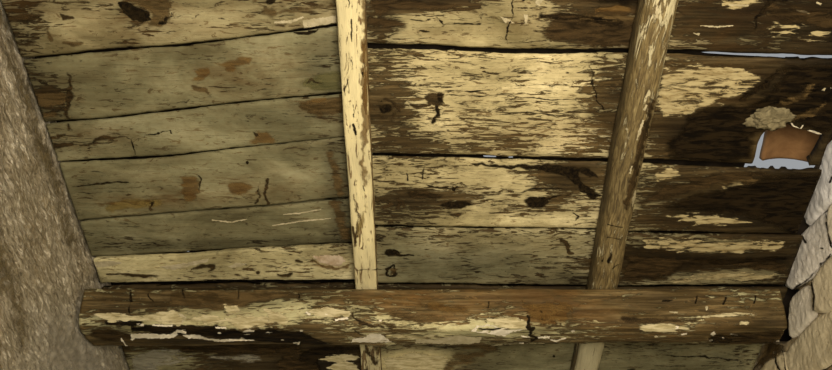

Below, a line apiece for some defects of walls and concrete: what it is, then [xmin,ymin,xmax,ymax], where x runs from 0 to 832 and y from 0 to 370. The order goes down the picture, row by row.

water stain [367,0,463,28]
crack [410,19,481,32]
crack [505,0,525,44]
peeling [657,63,760,117]
water stain [667,65,832,162]
water stain [623,99,821,234]
peeling [642,237,785,254]
peeling [671,272,775,283]
peeling [95,304,288,346]
peeling [306,307,351,321]
peeling [640,323,694,338]
peeling [702,306,754,325]